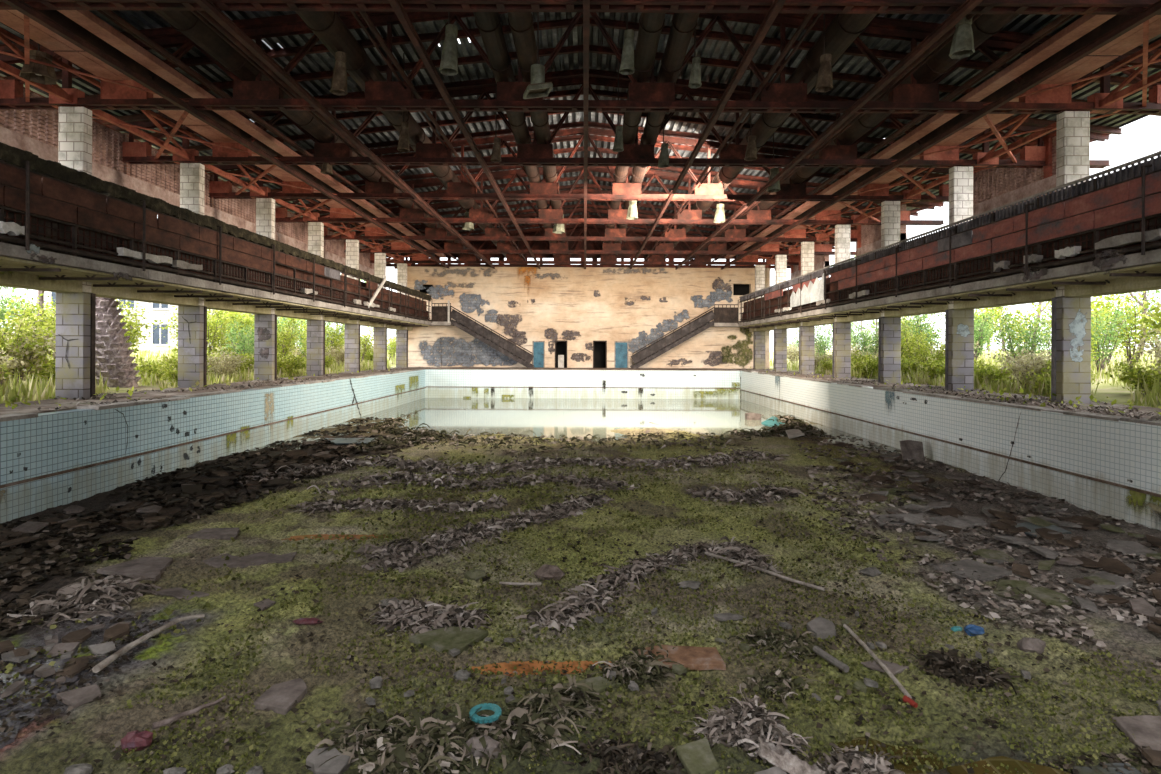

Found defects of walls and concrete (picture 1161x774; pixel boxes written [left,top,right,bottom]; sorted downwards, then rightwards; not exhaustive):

spalling [27,244,56,264]
flaking render [414,280,535,367]
flaking render [625,277,733,353]
flaking render [1069,309,1087,362]
flaking render [667,351,727,376]
peeling [162,404,200,460]
leakage [265,393,274,420]